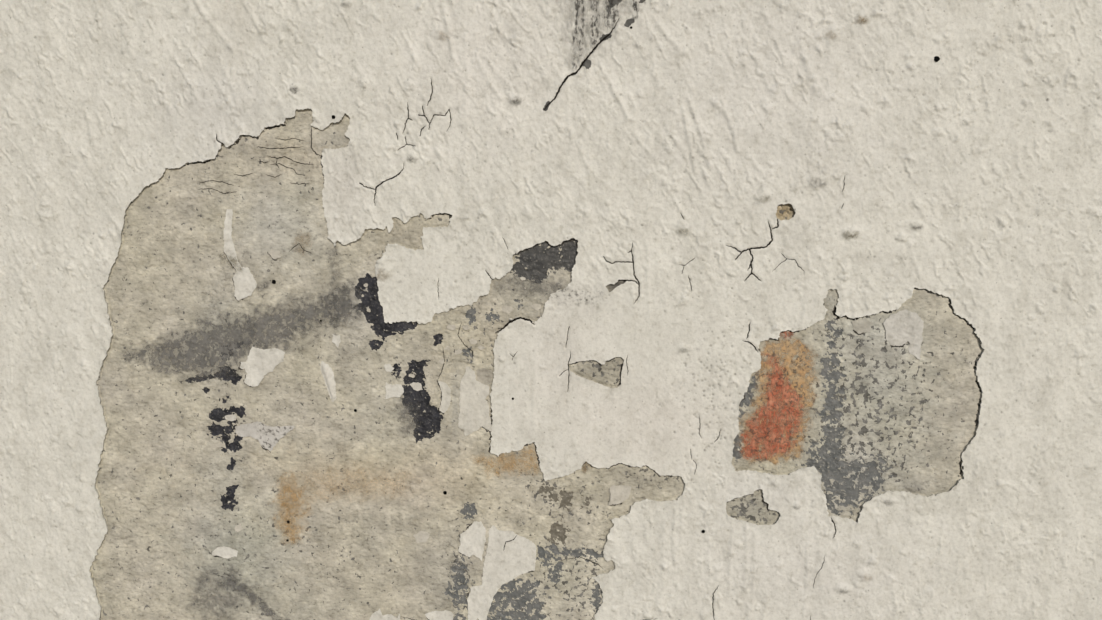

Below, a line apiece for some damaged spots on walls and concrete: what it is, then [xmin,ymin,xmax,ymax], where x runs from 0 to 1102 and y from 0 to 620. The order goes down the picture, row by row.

crack [543,0,645,111]
leakage [573,0,620,48]
crack [359,80,452,203]
crack [726,219,804,281]
spalling [776,203,796,221]
peeling [90,108,685,620]
corrosion [741,331,814,464]
peeling [731,287,984,522]
peeling [726,489,780,525]